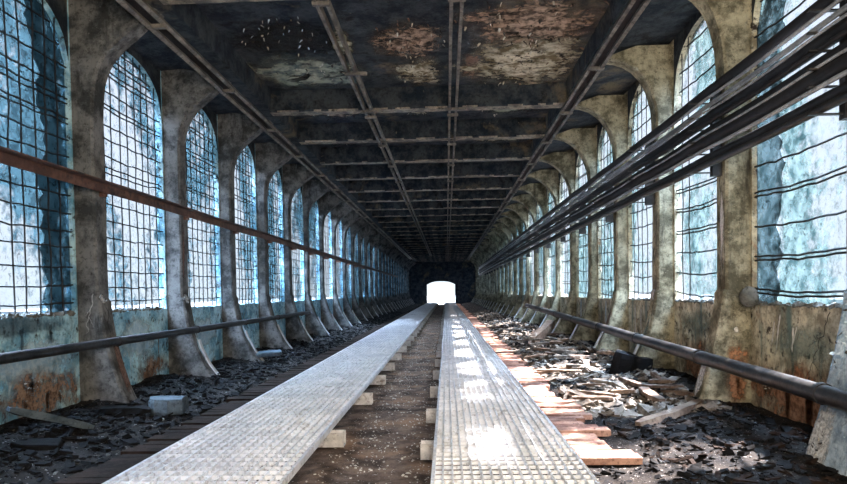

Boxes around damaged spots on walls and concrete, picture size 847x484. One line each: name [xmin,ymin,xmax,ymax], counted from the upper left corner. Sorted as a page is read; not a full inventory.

spalling [371,18,446,85]
peeling [453,0,604,85]